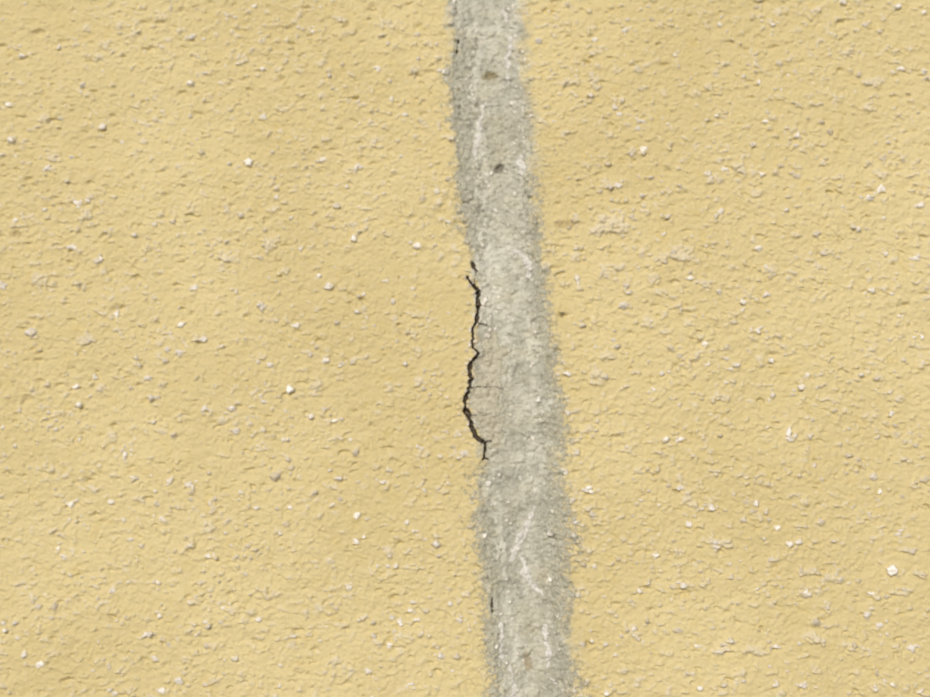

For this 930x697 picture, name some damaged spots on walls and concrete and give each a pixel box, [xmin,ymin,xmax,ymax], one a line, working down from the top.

crack [463,262,504,460]